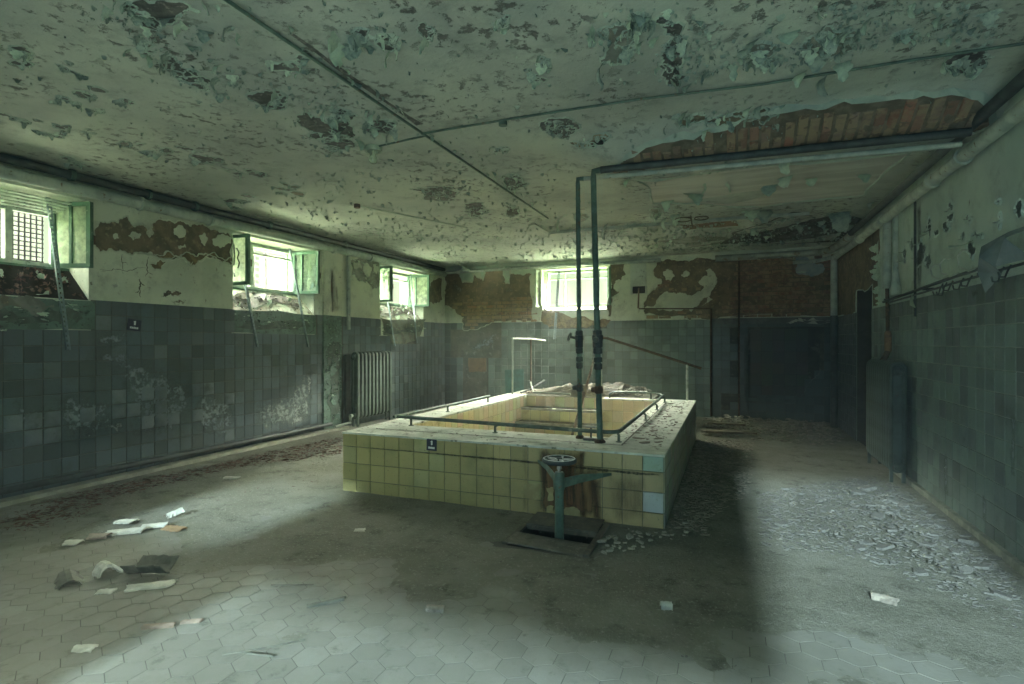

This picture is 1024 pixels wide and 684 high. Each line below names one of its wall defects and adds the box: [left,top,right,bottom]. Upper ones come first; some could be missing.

flaking render [71,0,1024,403]
flaking render [0,266,85,317]
water stain [259,373,311,427]